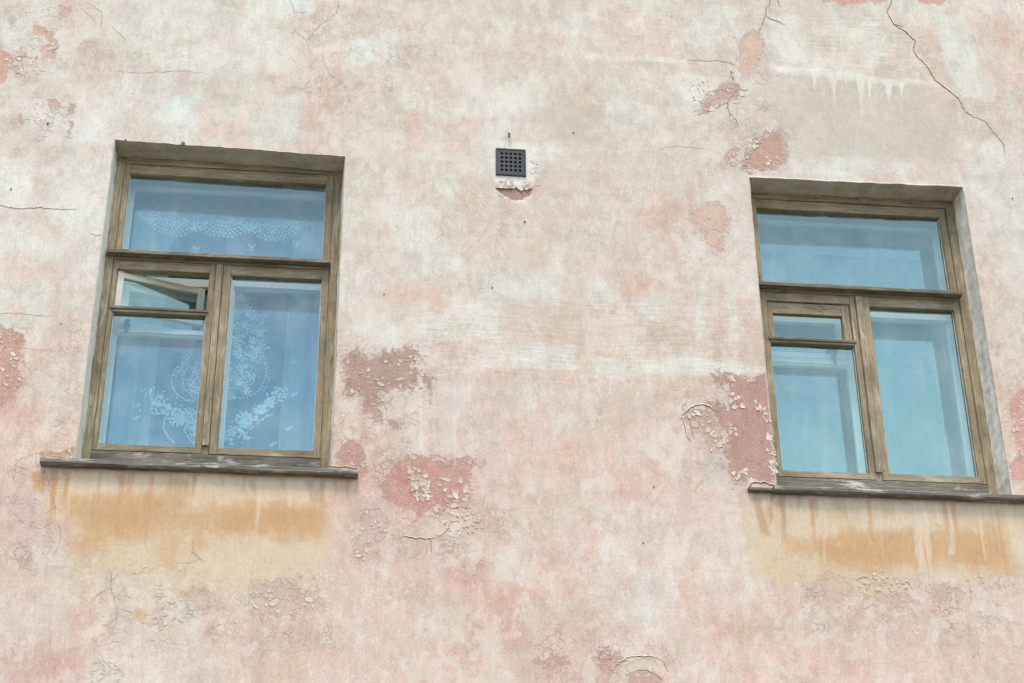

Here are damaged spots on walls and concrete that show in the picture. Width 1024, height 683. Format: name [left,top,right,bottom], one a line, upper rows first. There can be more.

crack [758,0,784,33]
crack [660,60,748,150]
damp [745,62,976,183]
crack [886,0,1005,153]
crack [0,203,75,211]
flaking render [496,180,532,201]
peeling [0,320,31,411]
peeling [338,341,435,436]
peeling [677,364,779,490]
peeling [333,435,482,520]
corrosion [26,462,349,595]
corrosion [729,480,1024,616]